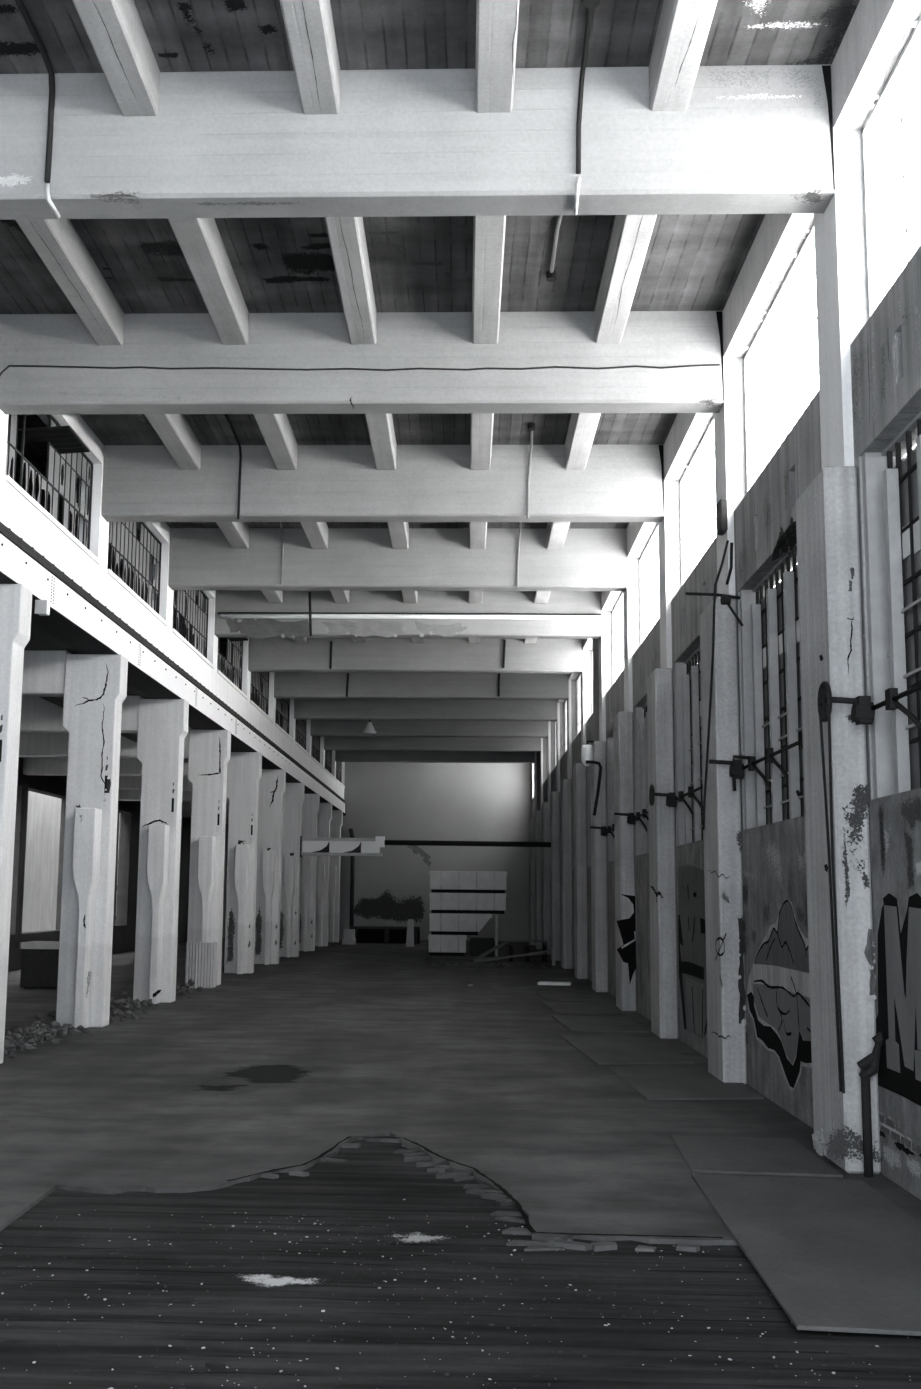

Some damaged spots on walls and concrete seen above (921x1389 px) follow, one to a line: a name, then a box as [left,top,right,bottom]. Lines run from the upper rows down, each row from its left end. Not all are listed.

crack [76,664,110,793]
flaking render [879,1111,921,1158]